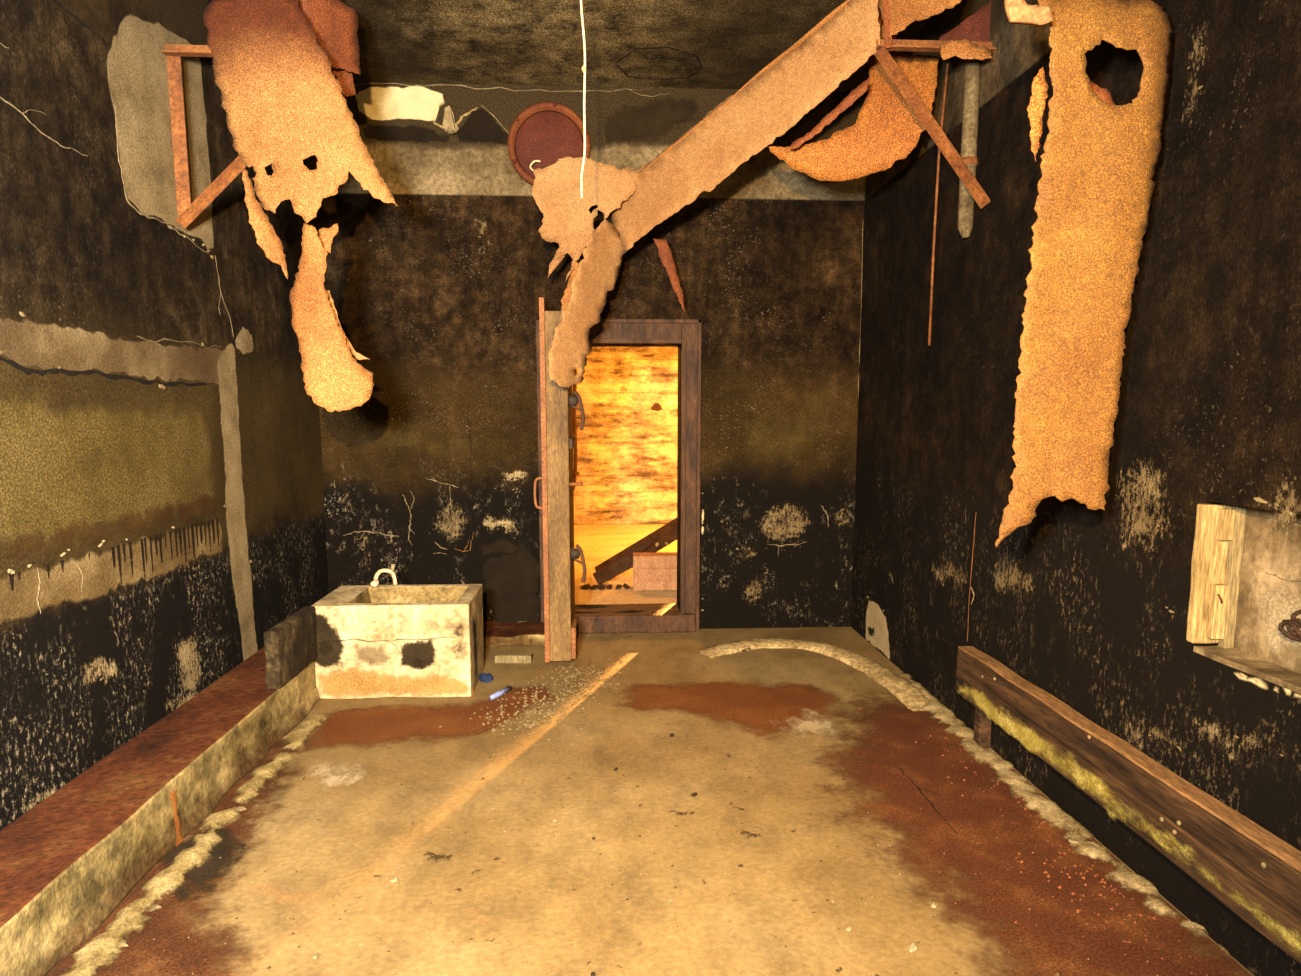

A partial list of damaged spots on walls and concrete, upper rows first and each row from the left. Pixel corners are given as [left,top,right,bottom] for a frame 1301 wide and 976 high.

flaking render [107,15,214,259]
peeling [355,85,509,144]
water stain [494,471,527,491]
water stain [760,505,810,542]
water stain [433,501,540,678]
water stain [742,579,762,602]
water stain [314,615,436,669]
water stain [159,828,245,900]
rust [45,669,552,976]
rust [625,682,1252,976]